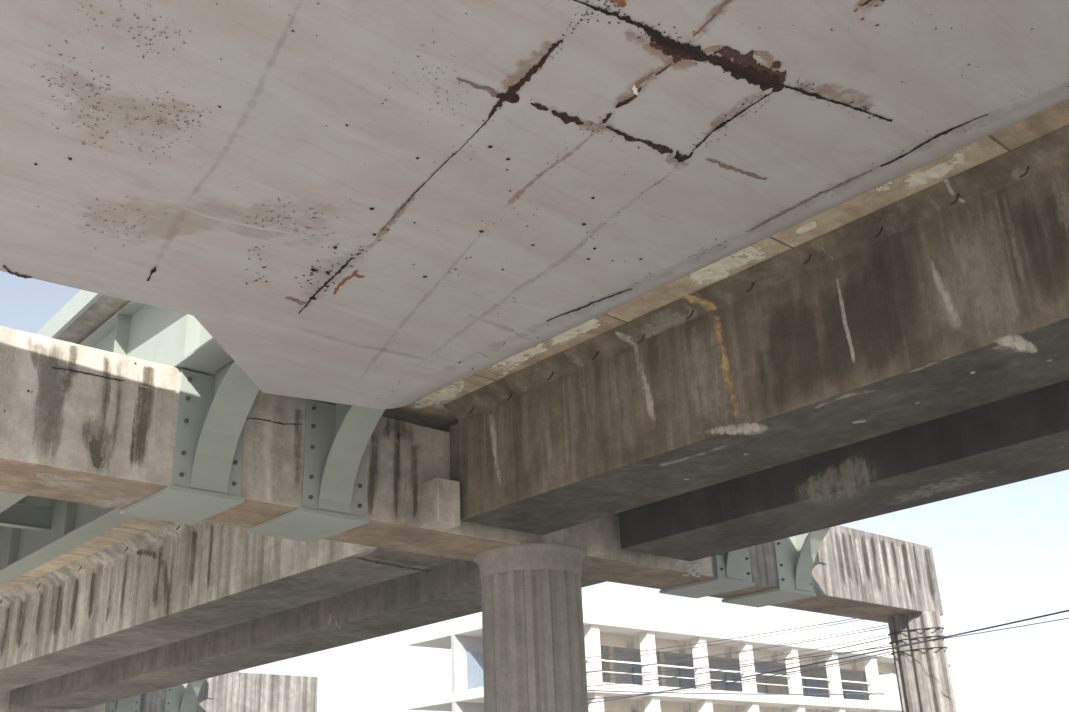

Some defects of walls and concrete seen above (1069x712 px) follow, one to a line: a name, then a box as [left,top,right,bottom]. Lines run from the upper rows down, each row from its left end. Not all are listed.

corrosion [31,40,222,164]
crack [380,0,893,232]
crack [750,114,988,231]
water stain [33,346,76,450]
water stain [131,367,154,461]
corrosion [244,196,367,314]
peeling [411,381,467,409]
peeling [490,318,603,377]
crack [547,288,633,322]
peeling [687,246,767,286]
corrosion [711,317,765,435]
water stain [931,216,1036,353]